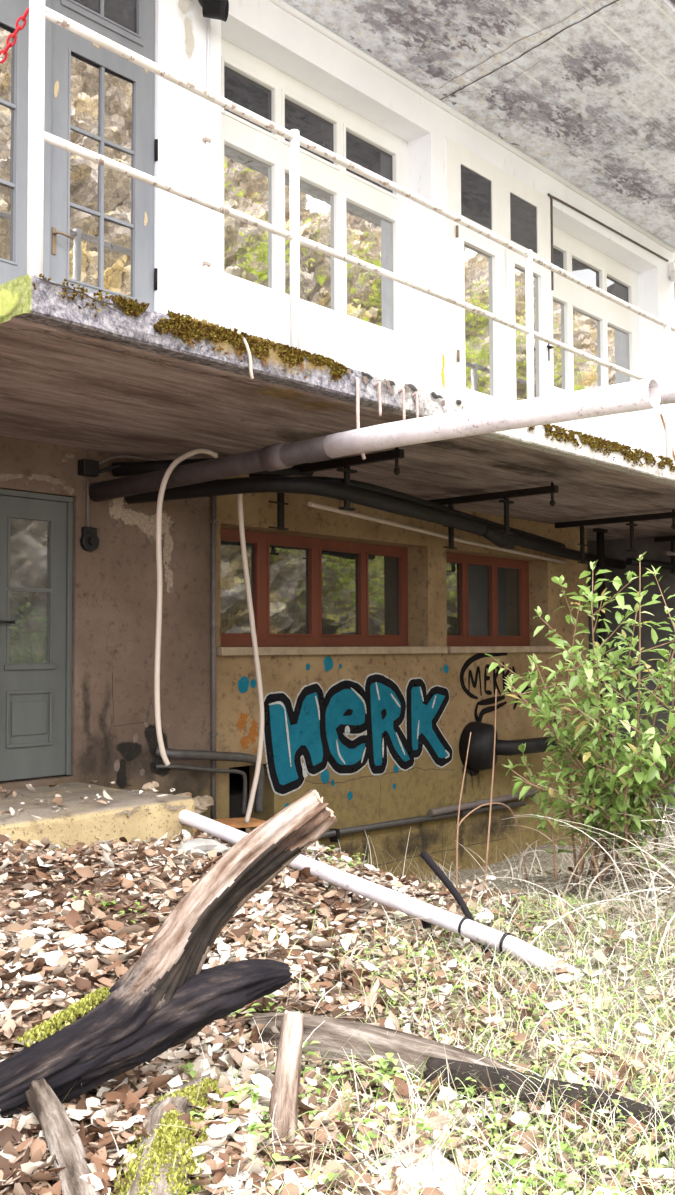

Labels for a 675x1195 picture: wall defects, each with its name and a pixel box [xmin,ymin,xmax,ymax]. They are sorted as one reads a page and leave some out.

leakage [355,0,544,105]
crack [439,0,622,100]
leakage [486,43,675,212]
peeling [108,497,176,593]